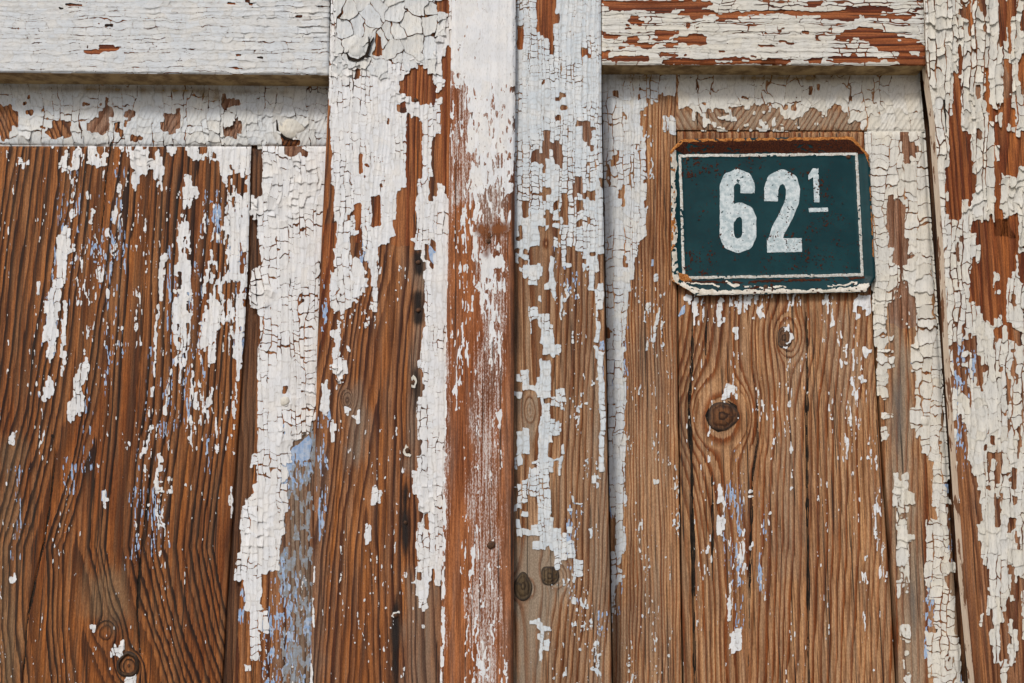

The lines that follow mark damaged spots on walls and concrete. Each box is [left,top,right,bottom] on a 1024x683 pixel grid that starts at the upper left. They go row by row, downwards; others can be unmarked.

crack [0,0,374,236]
crack [942,100,950,137]
rust [670,136,869,294]
peeling [27,374,56,416]
peeling [67,307,142,423]
peeling [514,427,530,469]
peeling [678,294,773,403]
peeling [90,624,141,670]
peeling [460,514,508,683]
peeling [529,618,567,679]
peeling [694,472,772,666]
peeling [864,472,915,598]